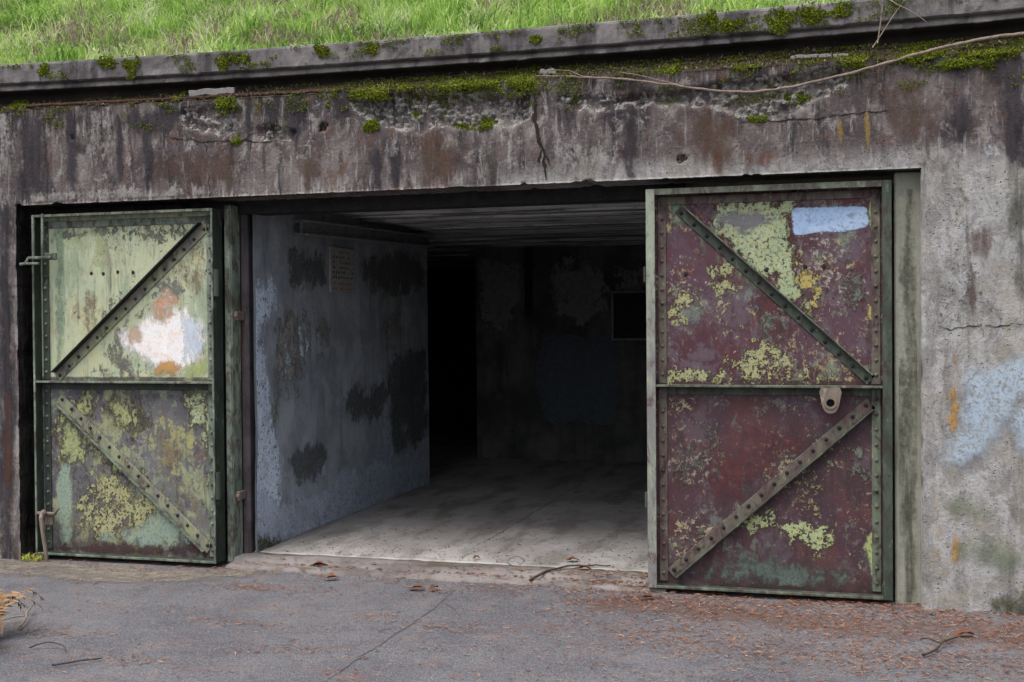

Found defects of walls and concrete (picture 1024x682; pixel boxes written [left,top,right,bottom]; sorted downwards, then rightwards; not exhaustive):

leakage [0,105,233,202]
leakage [373,140,407,186]
crack [532,96,551,180]
leakage [556,106,637,177]
leakage [879,81,974,186]
leakage [978,54,1024,172]
peeling [62,224,186,245]
peeling [91,279,185,380]
peeling [660,190,836,385]
crack [938,323,1023,333]
peeling [51,389,172,543]
peeling [740,477,834,557]